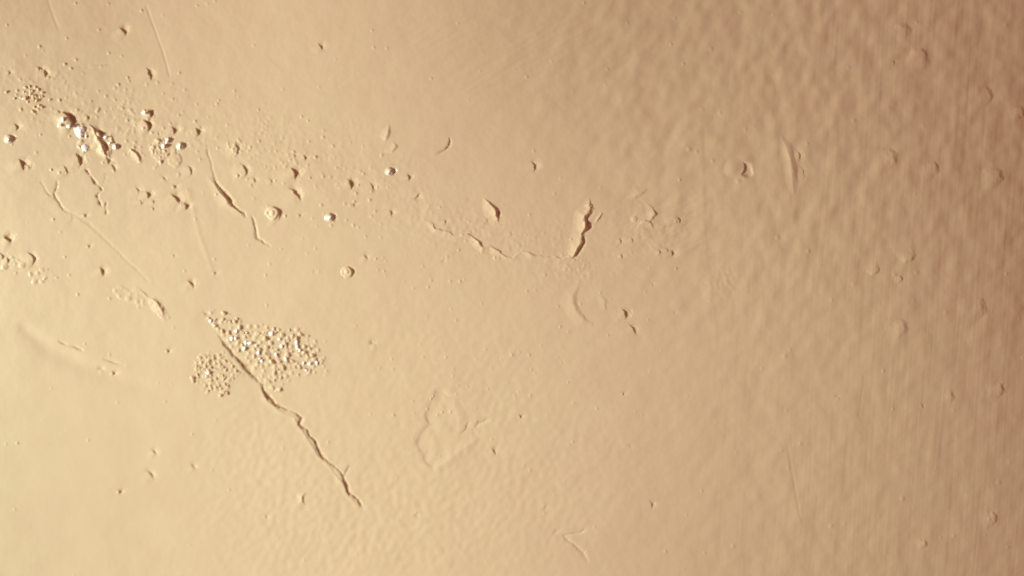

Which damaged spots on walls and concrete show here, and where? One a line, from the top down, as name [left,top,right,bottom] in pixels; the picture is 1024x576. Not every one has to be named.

crack [206,142,271,247]
crack [219,336,364,509]